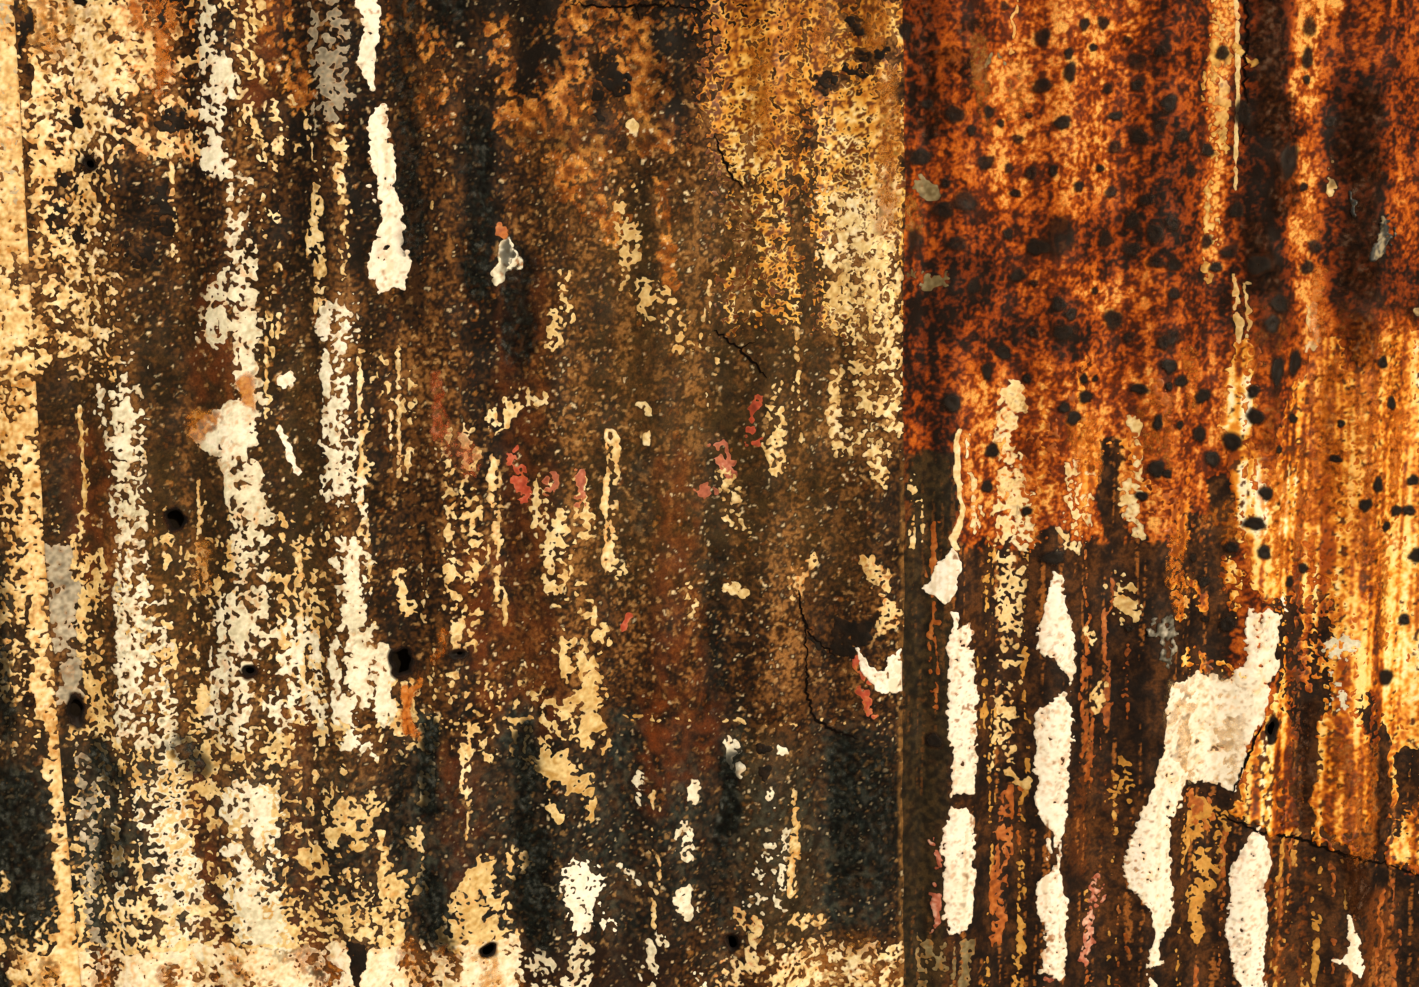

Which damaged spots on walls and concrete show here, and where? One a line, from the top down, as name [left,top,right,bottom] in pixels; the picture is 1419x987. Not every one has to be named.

corrosion [495,222,508,240]
peeling [613,0,978,537]
corrosion [1240,0,1319,294]
peeling [0,0,701,987]
crack [798,590,857,739]
corrosion [925,521,942,711]
peeling [693,0,1419,987]
corrosion [1078,549,1131,788]
corrosion [1262,471,1288,567]
corrosion [989,784,1024,947]
corrosion [1178,788,1229,987]
corrosion [1328,746,1402,987]